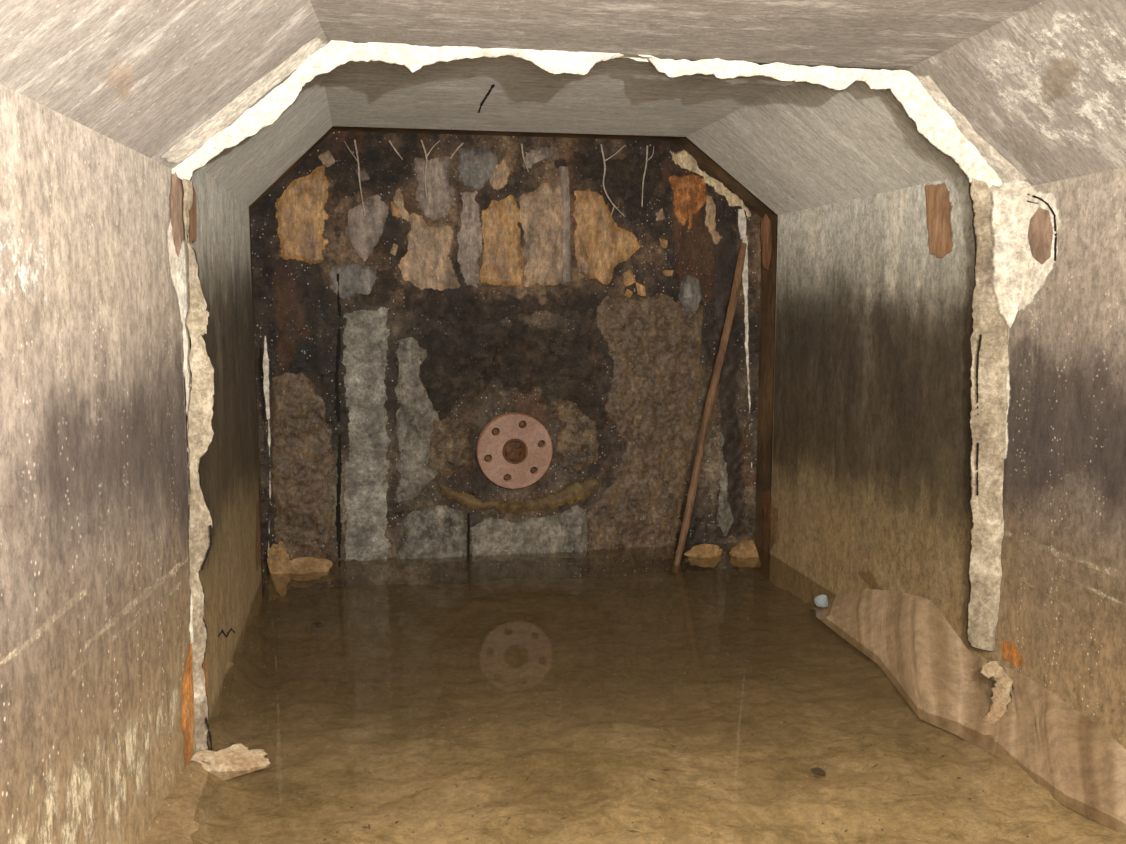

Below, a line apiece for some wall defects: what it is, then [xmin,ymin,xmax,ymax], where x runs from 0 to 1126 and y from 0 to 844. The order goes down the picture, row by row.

spalling [161,38,1060,753]
damp [1003,355,1126,503]
damp [0,590,86,663]
rust [181,644,208,767]